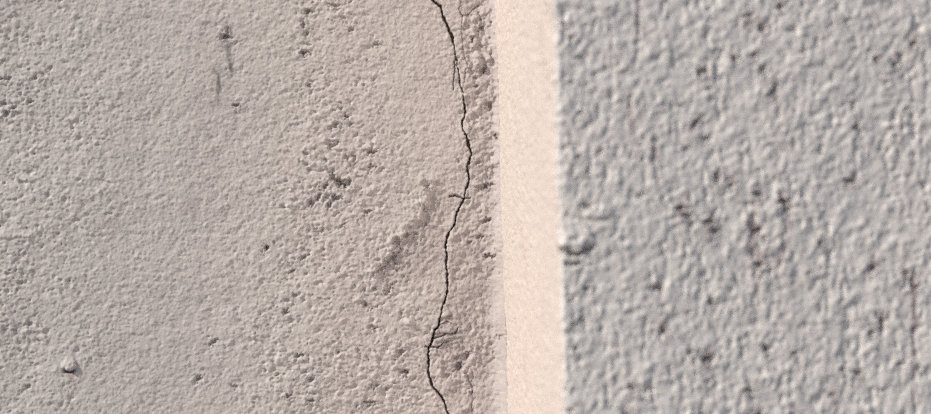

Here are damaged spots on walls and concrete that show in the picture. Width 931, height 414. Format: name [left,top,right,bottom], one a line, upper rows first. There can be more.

crack [427,0,472,414]